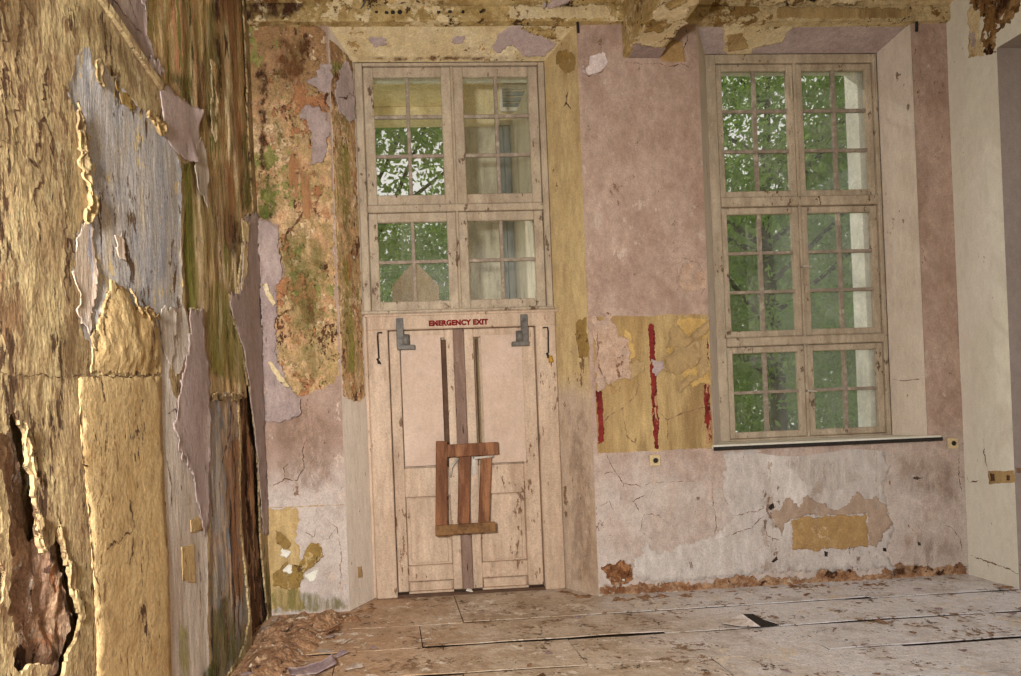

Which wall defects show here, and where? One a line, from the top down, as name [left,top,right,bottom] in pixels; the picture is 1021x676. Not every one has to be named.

water stain [247,0,302,20]
peeling [628,0,699,63]
peeling [722,0,909,55]
peeling [967,6,984,58]
spalling [67,0,366,676]
peeling [576,312,714,453]
spalling [0,422,87,676]
peeling [599,449,967,595]